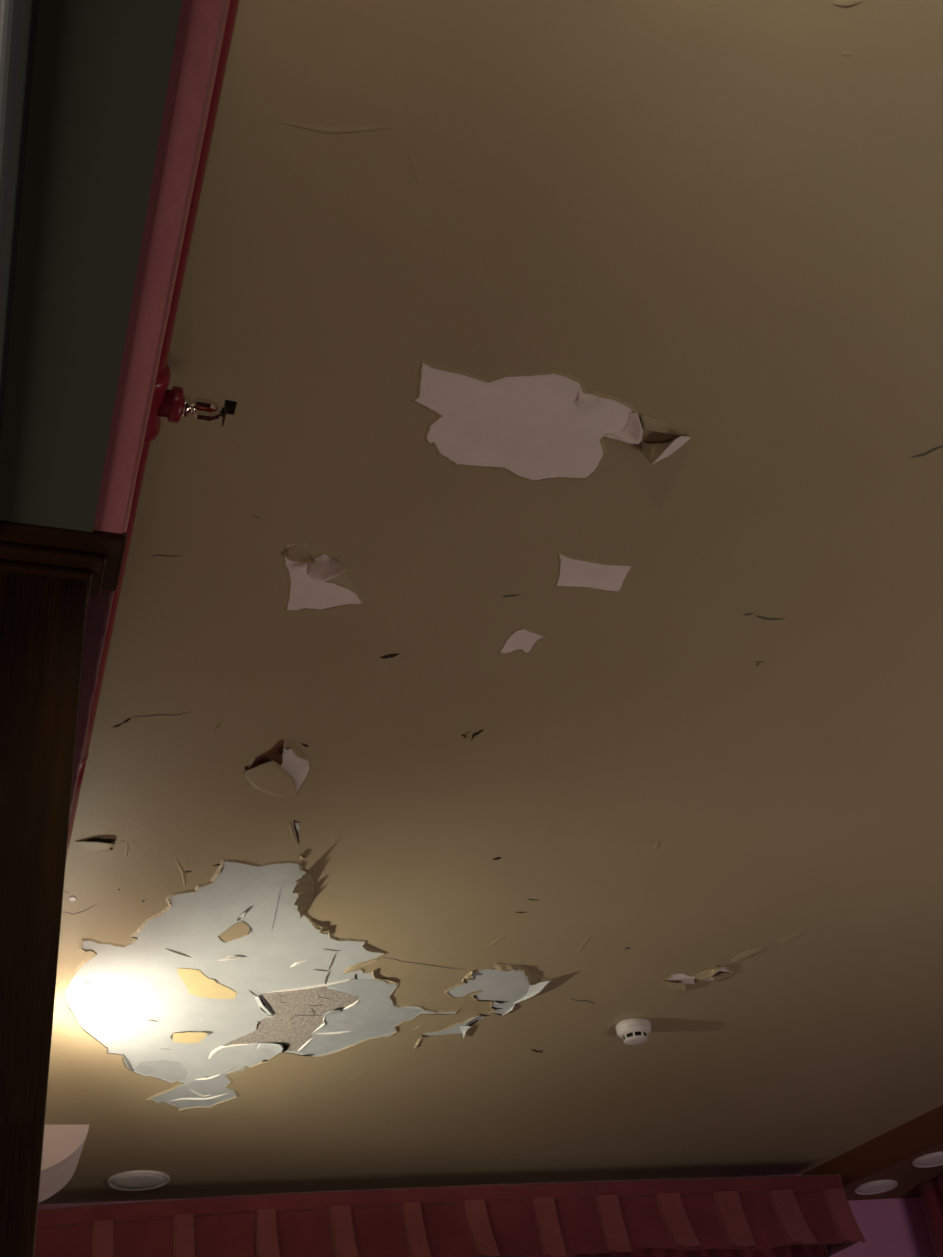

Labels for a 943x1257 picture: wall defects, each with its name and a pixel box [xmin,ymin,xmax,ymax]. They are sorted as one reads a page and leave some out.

peeling [411,359,691,482]
peeling [282,541,364,612]
peeling [554,552,634,592]
peeling [498,627,545,654]
peeling [244,738,311,797]
peeling [75,836,115,851]
peeling [62,859,552,1110]
peeling [661,966,733,993]